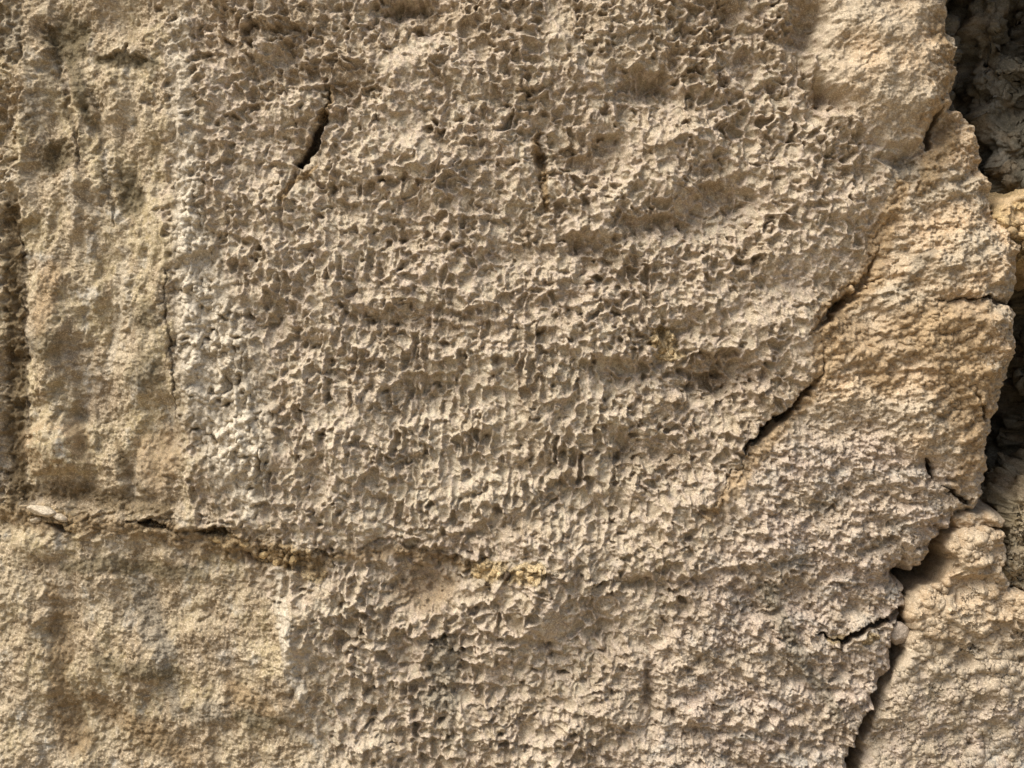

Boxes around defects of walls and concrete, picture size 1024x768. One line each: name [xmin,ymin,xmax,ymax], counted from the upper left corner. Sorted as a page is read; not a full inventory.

crack [298,91,332,169]
crack [744,385,813,456]
crack [125,519,236,537]
crack [818,617,890,650]